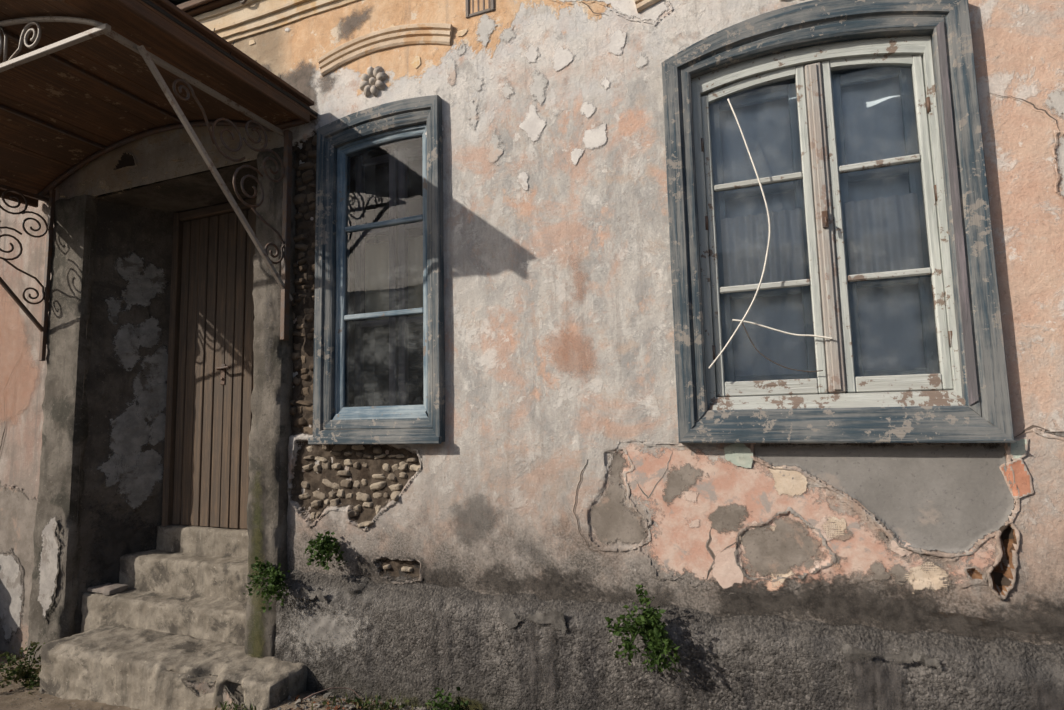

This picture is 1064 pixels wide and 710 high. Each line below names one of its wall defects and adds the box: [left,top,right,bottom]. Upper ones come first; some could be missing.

peeling [552,0,673,55]
peeling [519,45,574,144]
peeling [571,101,607,165]
crack [987,92,1060,134]
flaking render [287,130,422,531]
peeling [94,252,169,512]
crack [1014,423,1064,453]
peeling [585,439,1021,600]
peeling [0,513,60,645]
damp [287,605,368,658]
damp [352,555,674,608]
damp [710,572,1064,647]